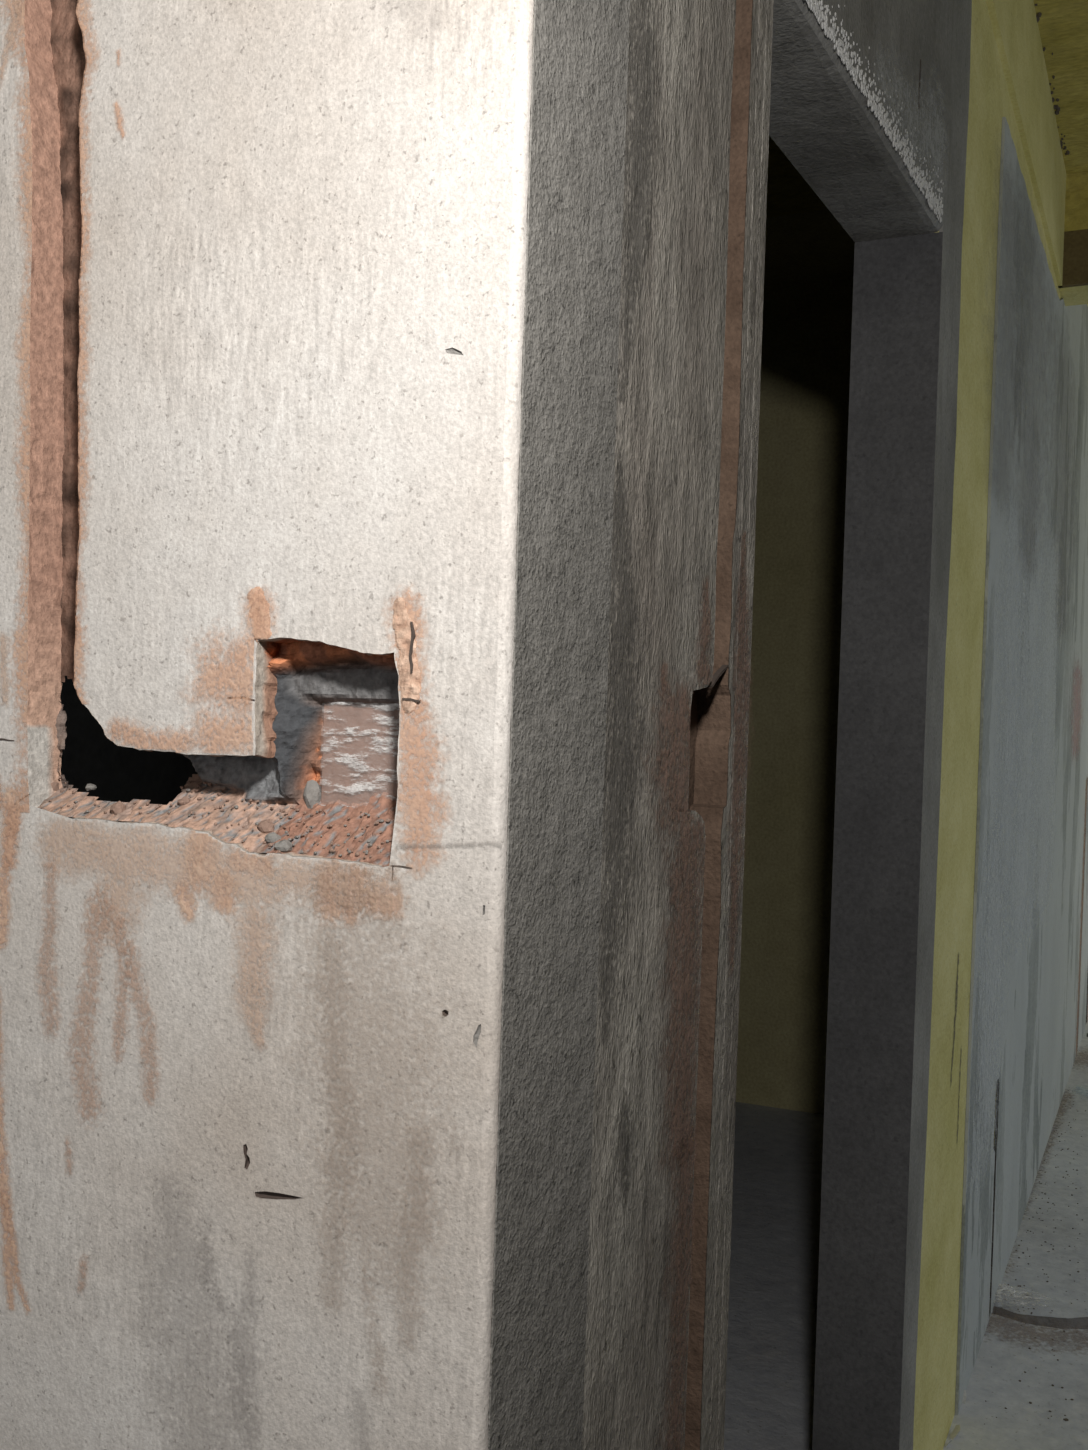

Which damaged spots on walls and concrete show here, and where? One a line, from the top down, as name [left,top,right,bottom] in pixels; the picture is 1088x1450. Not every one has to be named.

corrosion [76,0,95,543]
corrosion [0,557,29,949]
corrosion [73,568,86,704]
corrosion [395,590,445,870]
corrosion [0,1088,30,1311]